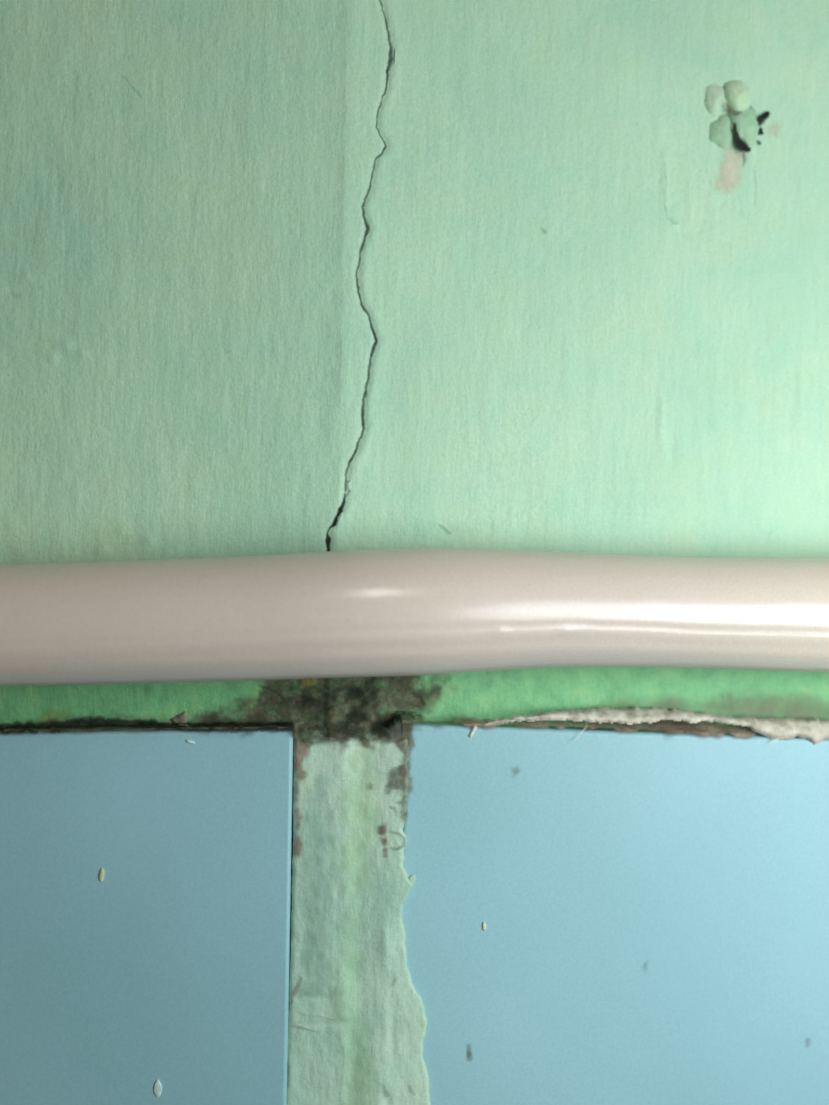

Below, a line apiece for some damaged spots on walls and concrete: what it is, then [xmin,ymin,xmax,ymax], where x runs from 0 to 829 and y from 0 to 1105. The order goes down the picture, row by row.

crack [326,21,397,551]
water stain [190,676,441,820]
peeling [468,706,829,745]